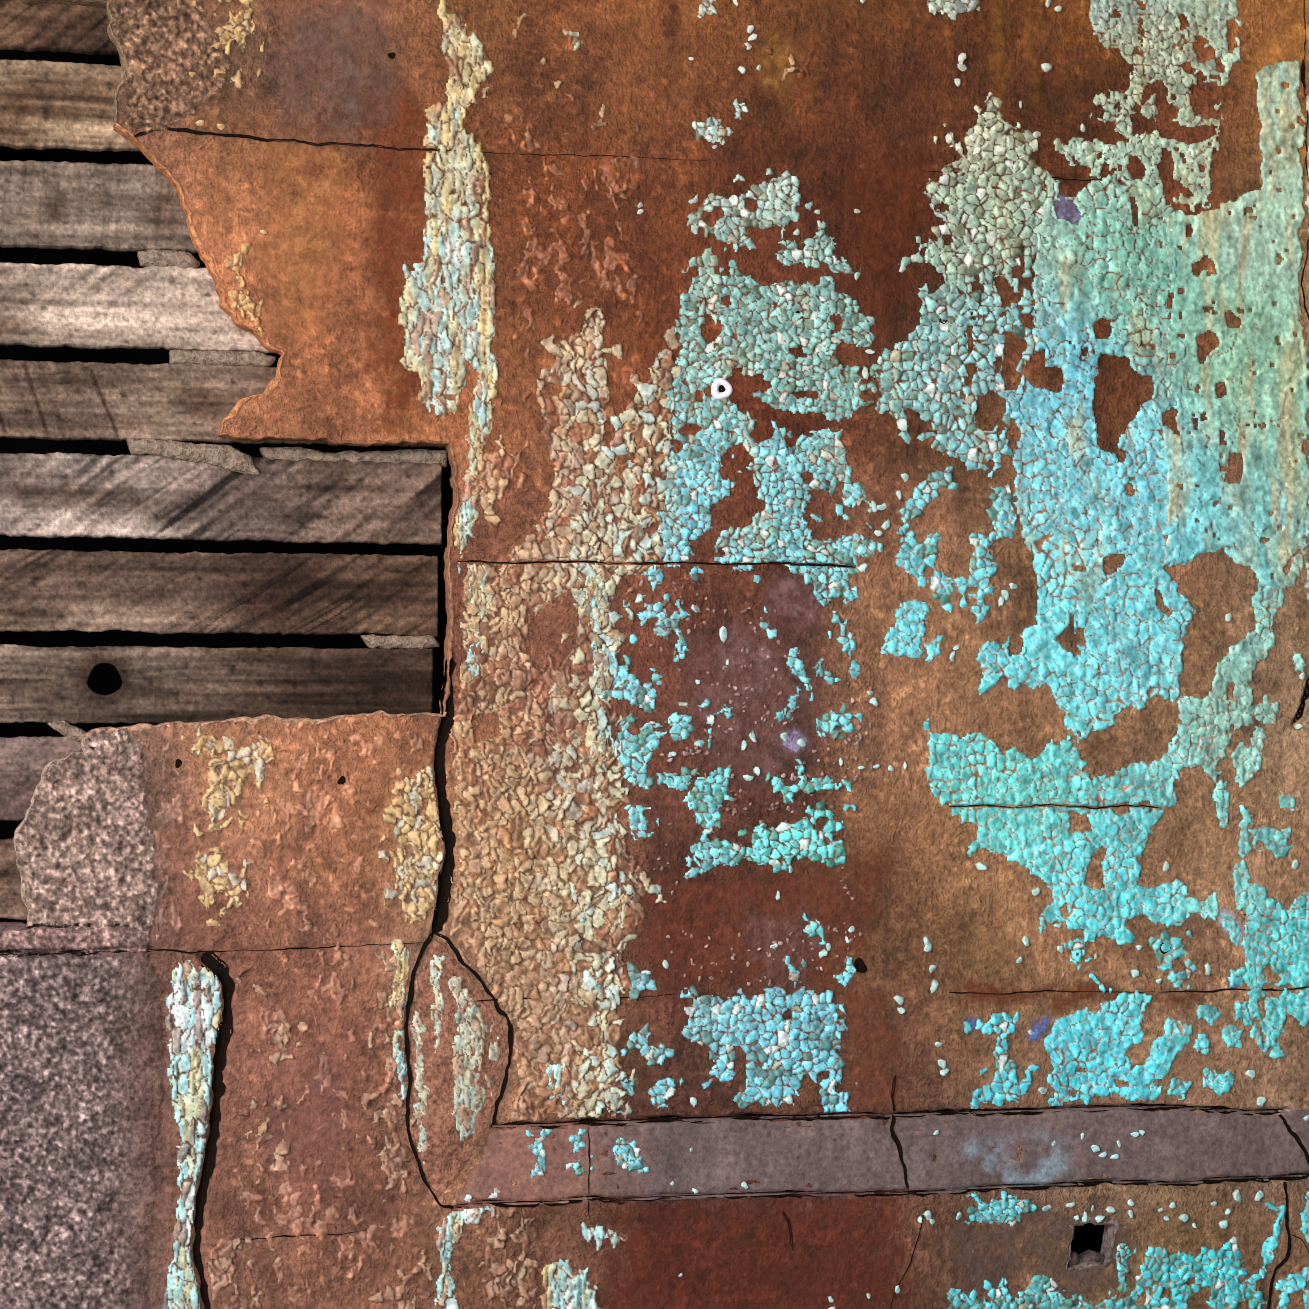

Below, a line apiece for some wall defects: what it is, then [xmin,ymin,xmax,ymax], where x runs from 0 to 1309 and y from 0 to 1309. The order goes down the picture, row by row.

rust [1257,0,1309,77]
rust [268,150,341,337]
rust [368,93,425,426]
flaking render [0,0,529,1309]
crack [0,658,1309,1309]
peeling [526,1129,553,1179]
peeling [566,1128,593,1176]
peeling [613,1138,649,1174]
peeling [1080,1130,1145,1159]
peeling [233,1159,603,1309]
peeling [581,1222,628,1251]
peeling [947,1189,1309,1309]